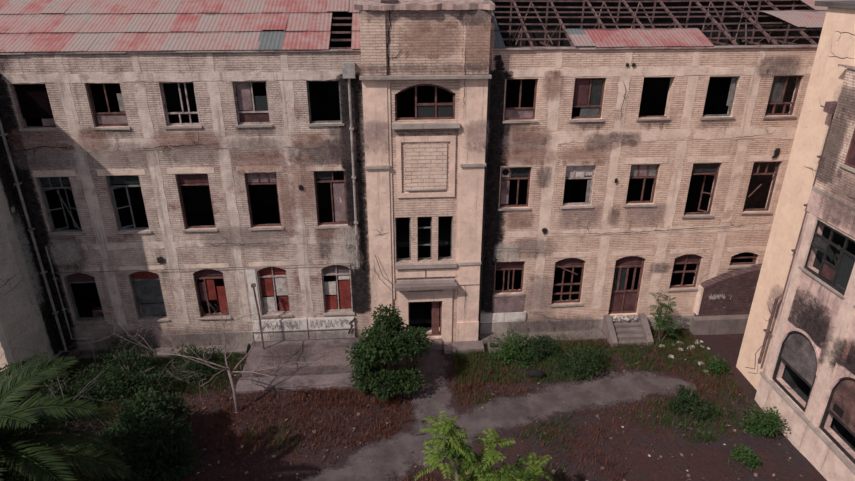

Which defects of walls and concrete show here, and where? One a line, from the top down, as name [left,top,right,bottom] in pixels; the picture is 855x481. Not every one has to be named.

crack [387,10,402,67]
water stain [483,236,517,262]